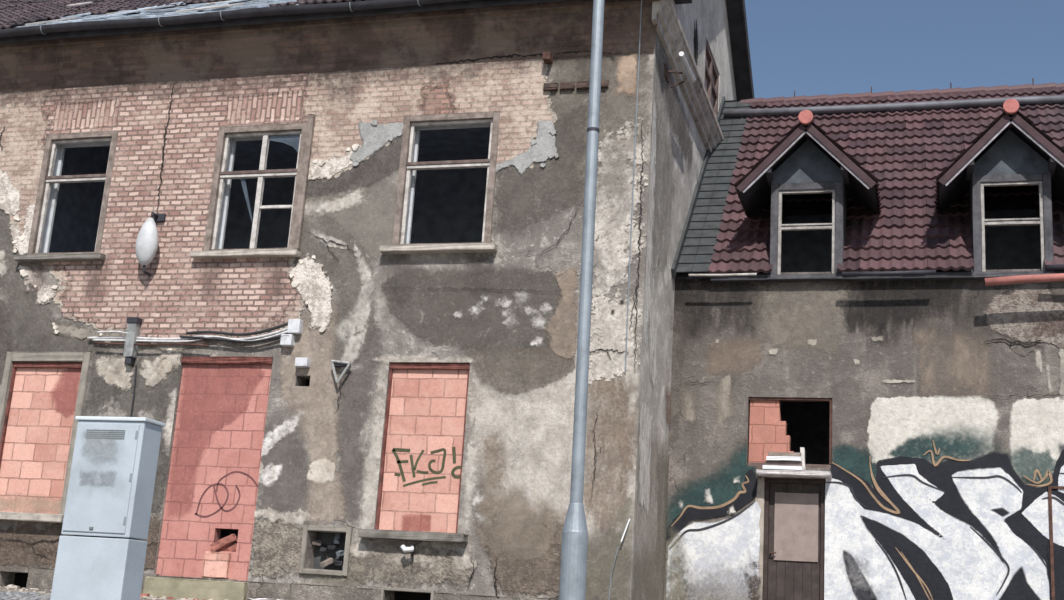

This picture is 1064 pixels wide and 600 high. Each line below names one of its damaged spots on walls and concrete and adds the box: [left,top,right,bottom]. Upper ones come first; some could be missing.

flaking render [0,58,559,390]
damp [494,31,692,387]
peeling [164,390,176,447]
damp [257,135,578,524]
flaking render [373,355,477,426]
damp [585,278,778,600]
damp [844,280,978,395]
flaking render [983,289,1064,348]
damp [403,515,431,531]